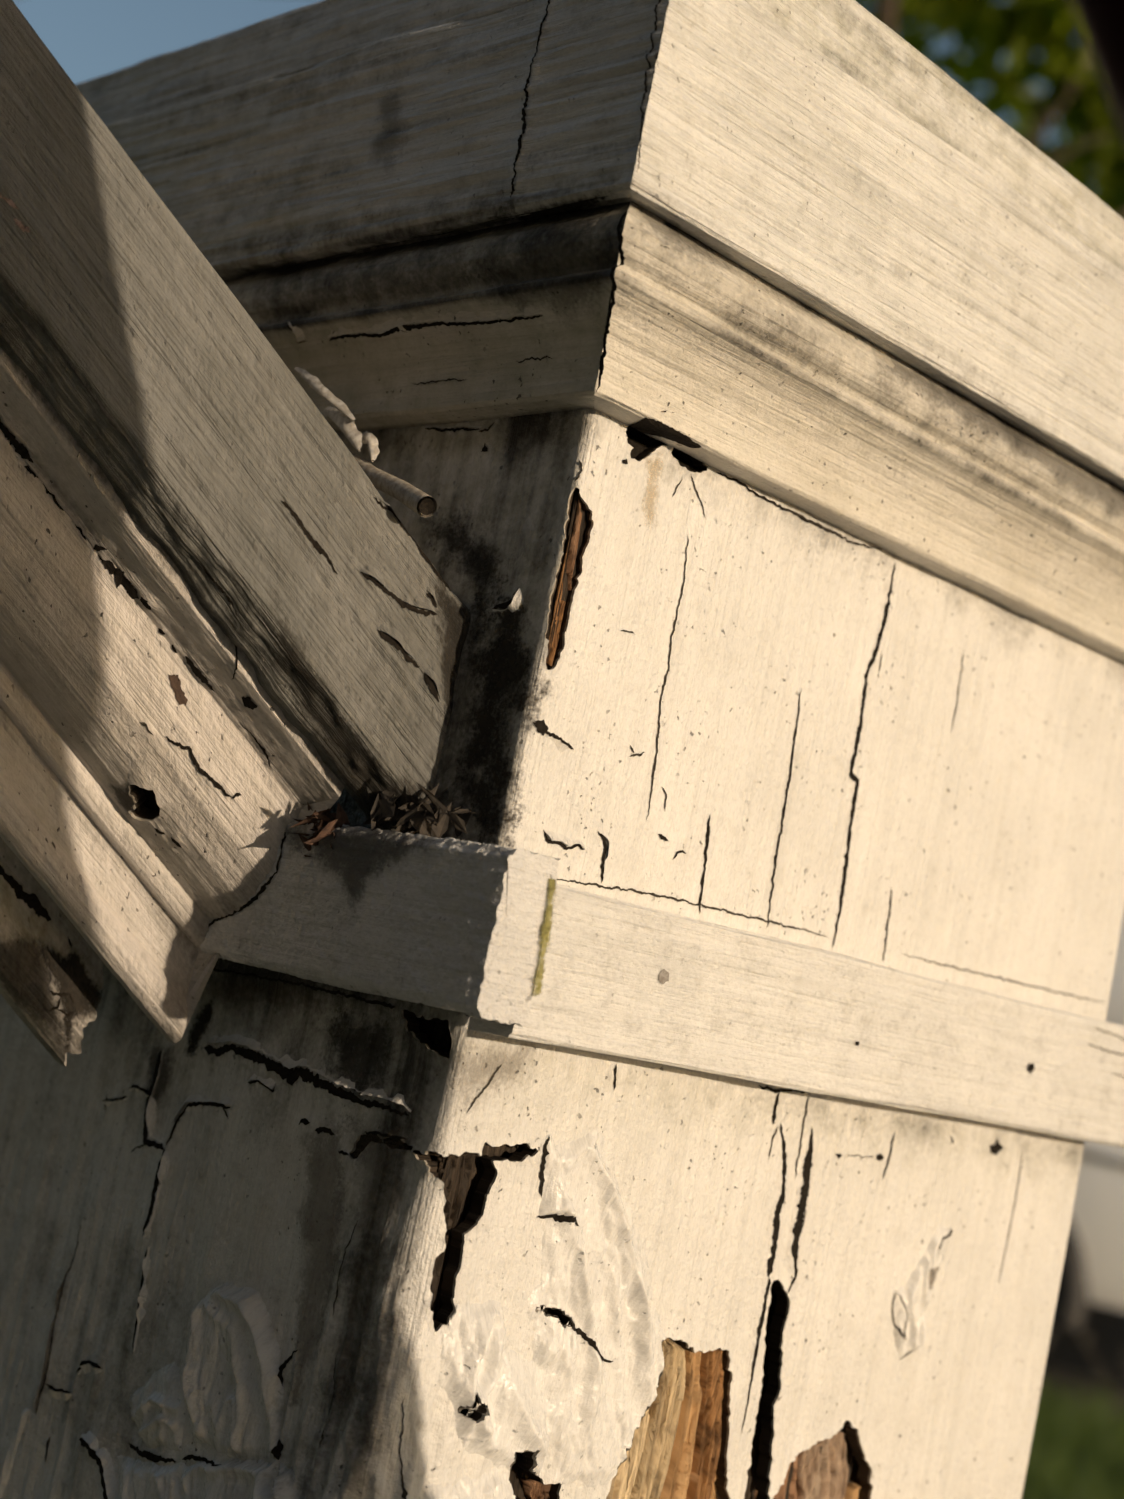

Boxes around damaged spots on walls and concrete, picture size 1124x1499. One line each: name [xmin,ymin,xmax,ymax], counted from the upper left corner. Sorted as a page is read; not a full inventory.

crack [510,0,550,197]
crack [287,305,543,343]
crack [414,377,467,385]
crack [517,355,552,363]
water stain [275,621,423,899]
water stain [420,512,550,847]
crack [544,472,896,947]
water stain [326,1012,390,1097]
crack [883,889,1124,1077]
crack [34,1034,412,1499]
crack [742,1085,813,1429]